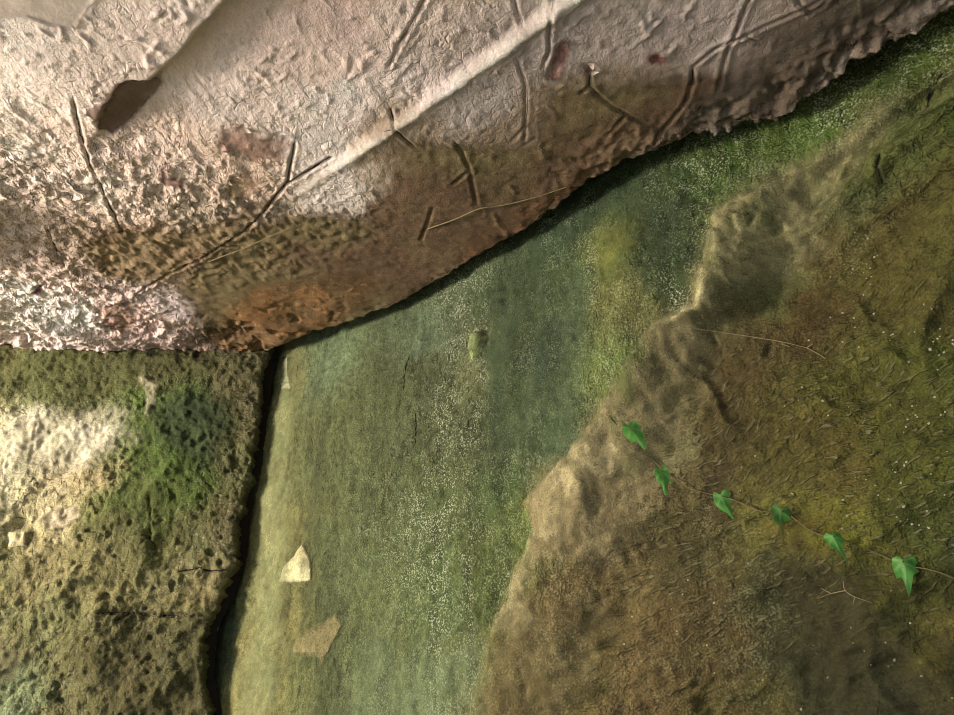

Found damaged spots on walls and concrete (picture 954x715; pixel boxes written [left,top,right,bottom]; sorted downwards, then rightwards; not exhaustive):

peeling [0,0,94,30]
crack [385,0,424,73]
crack [689,0,827,81]
spalling [87,77,161,133]
crack [71,92,123,232]
crack [137,134,330,294]
rust [461,181,581,263]
rust [215,277,373,351]
leakage [0,349,211,416]
leakage [3,416,115,471]
crack [95,357,279,715]
leakage [243,382,292,715]